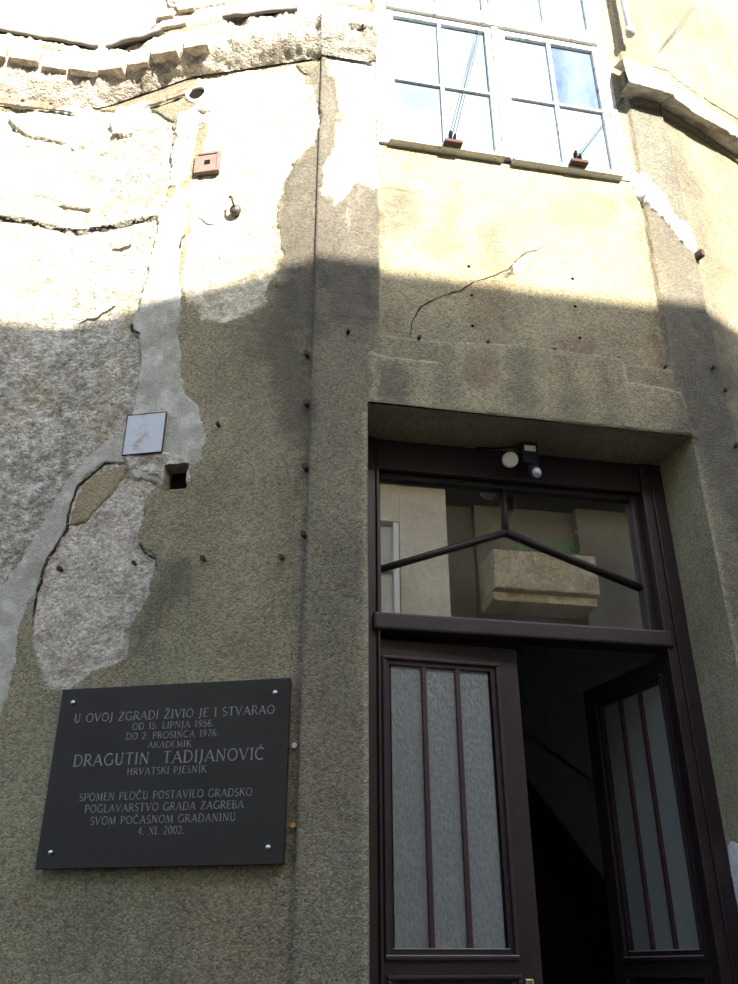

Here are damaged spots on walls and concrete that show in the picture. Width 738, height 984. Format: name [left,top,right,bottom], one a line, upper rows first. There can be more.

spalling [0,0,371,80]
peeling [317,47,381,206]
crack [0,194,157,252]
crack [79,305,140,334]
spalling [0,65,320,591]
leakage [273,60,381,431]
crack [410,244,542,334]
peeling [31,464,158,690]